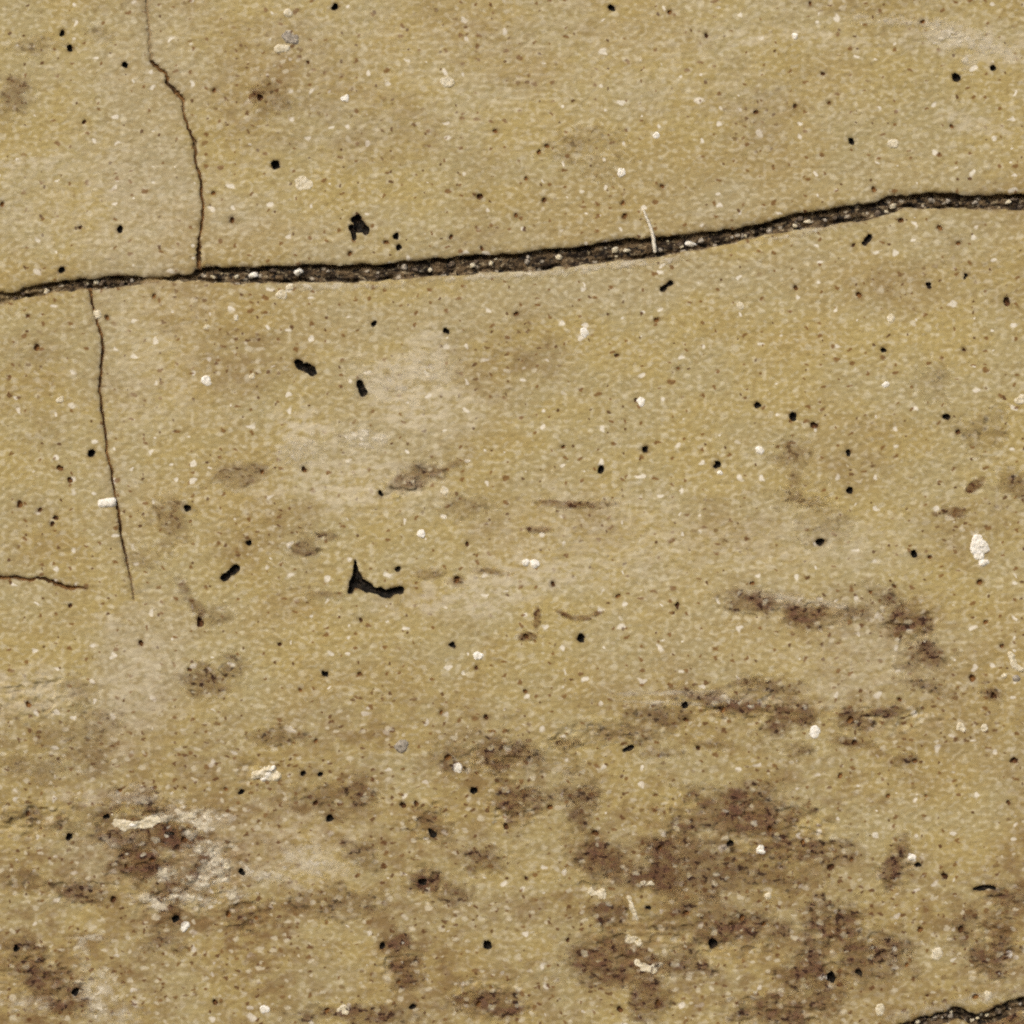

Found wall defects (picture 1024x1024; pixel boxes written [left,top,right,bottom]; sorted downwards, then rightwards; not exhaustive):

crack [0,0,1024,600]
leakage [730,590,824,628]
leakage [890,610,942,667]
leakage [632,680,813,734]
leakage [840,706,900,729]
leakage [483,736,531,767]
leakage [496,790,538,822]
leakage [574,782,854,890]
leakage [882,840,906,880]
leakage [571,903,790,1020]
leakage [737,894,910,1024]
leakage [970,917,1012,977]